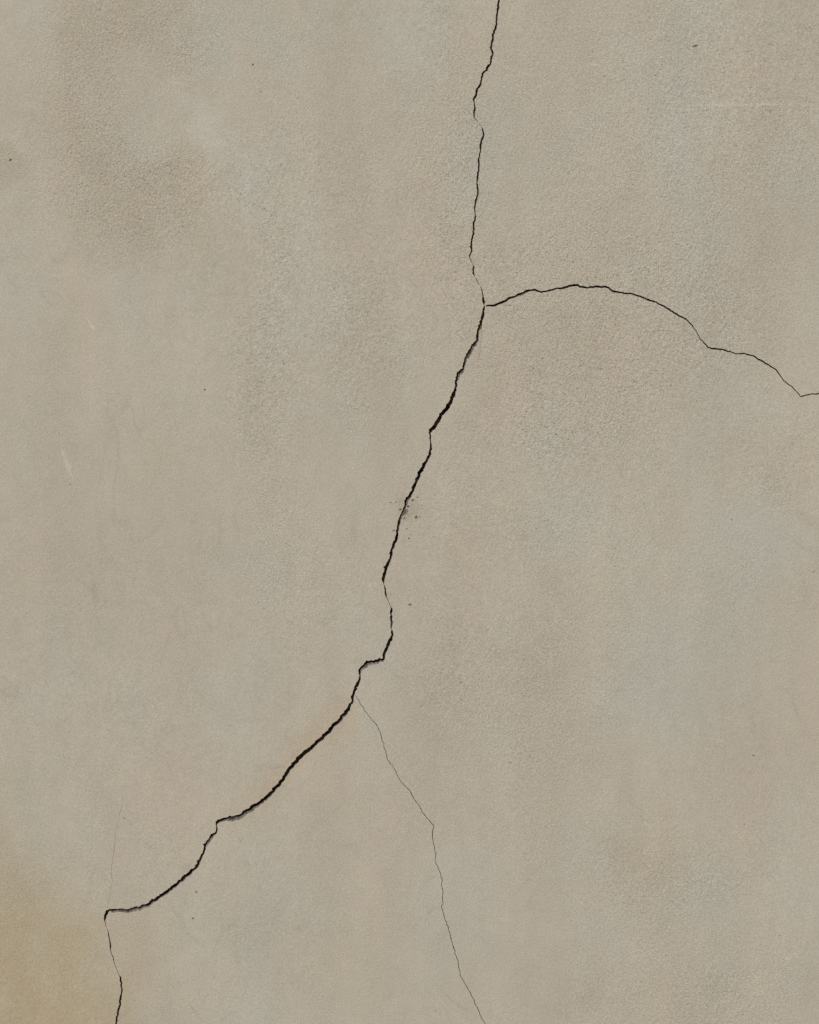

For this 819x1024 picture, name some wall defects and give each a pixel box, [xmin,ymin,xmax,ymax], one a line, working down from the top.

crack [473,0,500,121]
crack [104,125,819,1024]